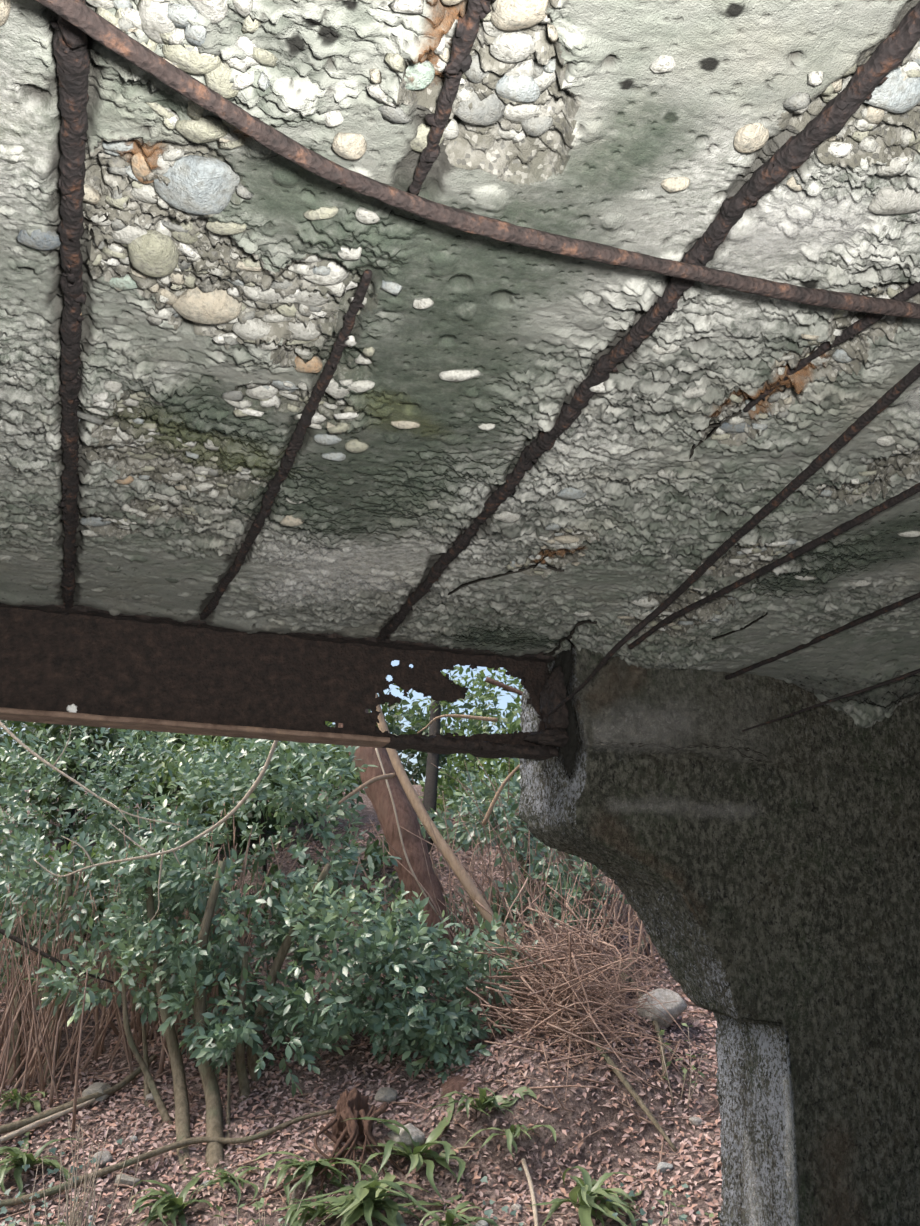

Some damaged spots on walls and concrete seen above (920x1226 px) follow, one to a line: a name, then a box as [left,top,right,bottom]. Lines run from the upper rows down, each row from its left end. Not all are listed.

spalling [0,0,11,26]
corrosion [420,0,463,77]
corrosion [126,139,161,170]
spalling [17,0,920,642]
corrosion [713,355,824,416]
crack [689,410,745,459]
spalling [546,363,920,717]
corrosion [374,687,430,734]
corrosion [445,665,469,703]
corrosion [494,665,542,719]
spalling [742,668,920,732]